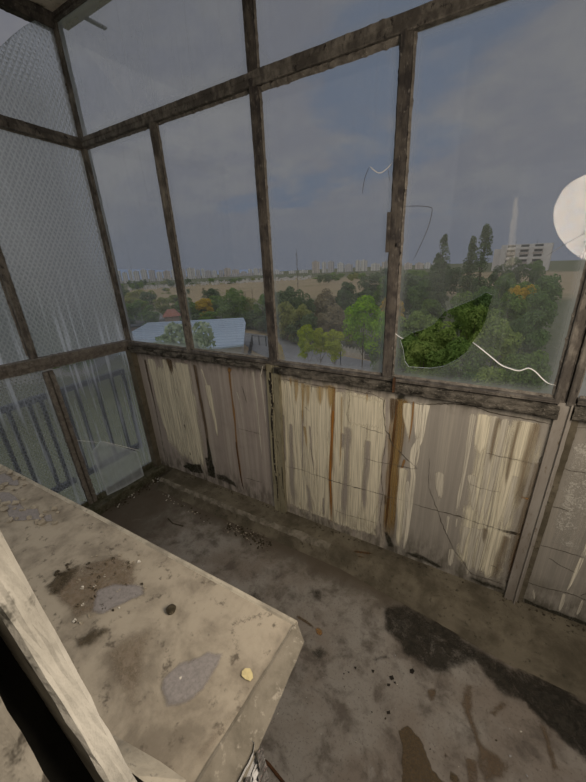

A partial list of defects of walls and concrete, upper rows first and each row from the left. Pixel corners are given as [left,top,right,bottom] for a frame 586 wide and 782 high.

peeling [268,372,284,505]
rust [319,385,342,517]
rust [384,395,414,546]
crack [284,379,519,585]
crack [411,402,551,428]
leakage [524,599,586,625]
leakage [385,607,586,782]
spalling [245,748,270,782]